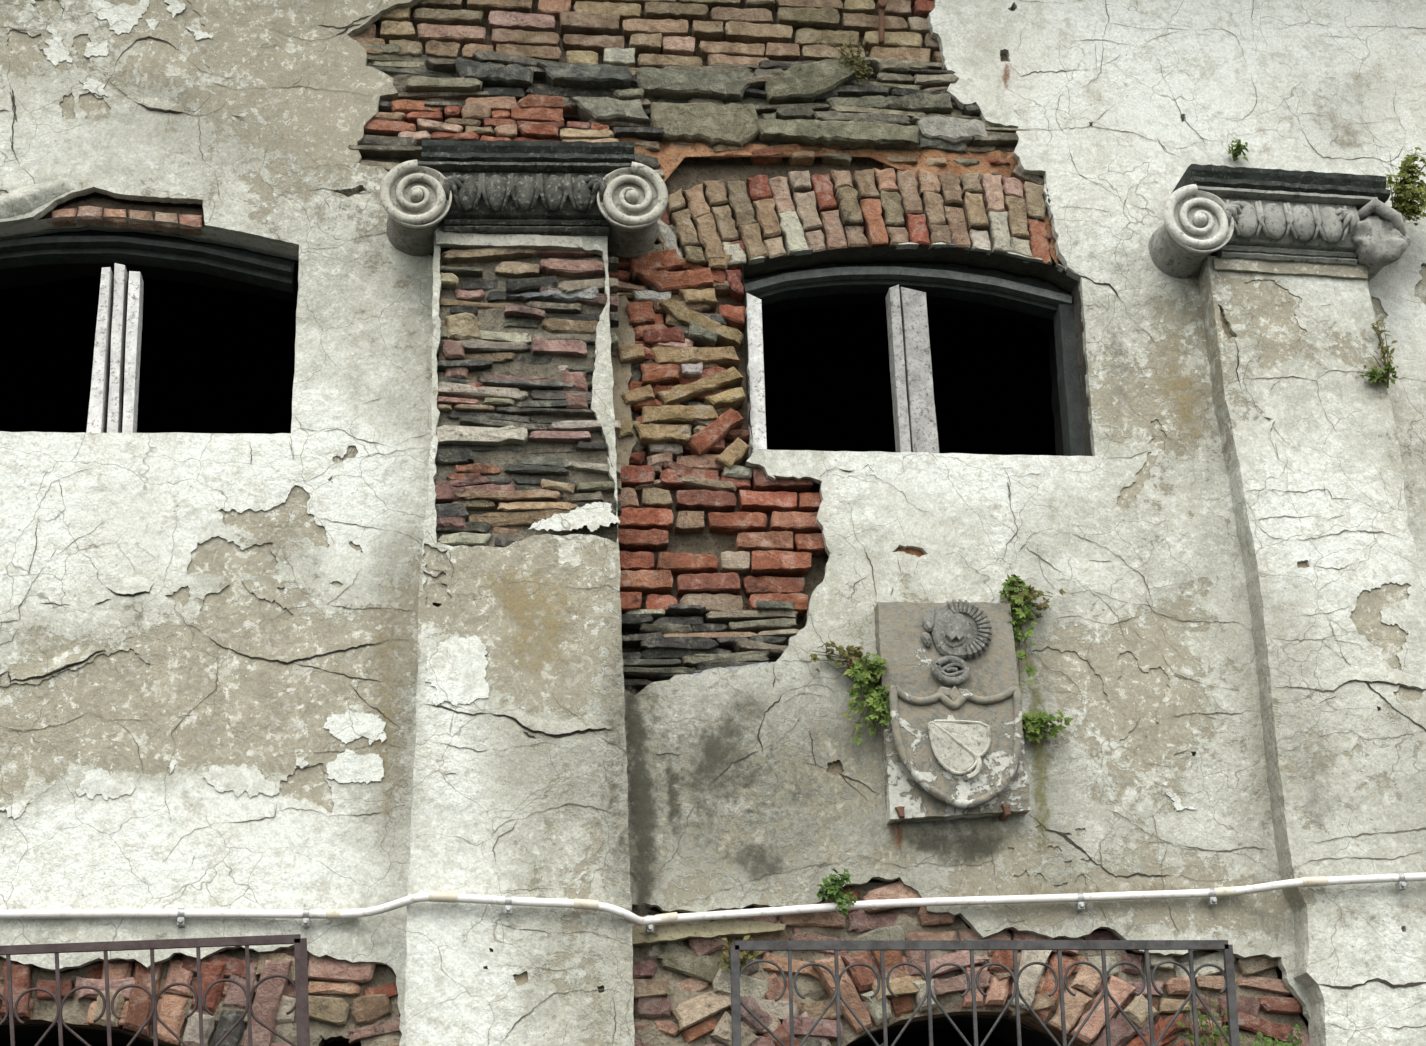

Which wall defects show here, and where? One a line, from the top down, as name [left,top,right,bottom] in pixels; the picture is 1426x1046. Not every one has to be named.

spalling [1,192,206,238]
crack [88,26,375,208]
crack [1009,0,1426,347]
spalling [348,0,1075,695]
crack [1231,339,1425,570]
peeling [166,486,330,639]
crack [991,467,1426,768]
peeling [203,709,387,813]
crack [0,464,879,1046]
crack [1031,809,1426,933]
spalling [0,947,401,1046]
spalling [632,881,1310,1046]